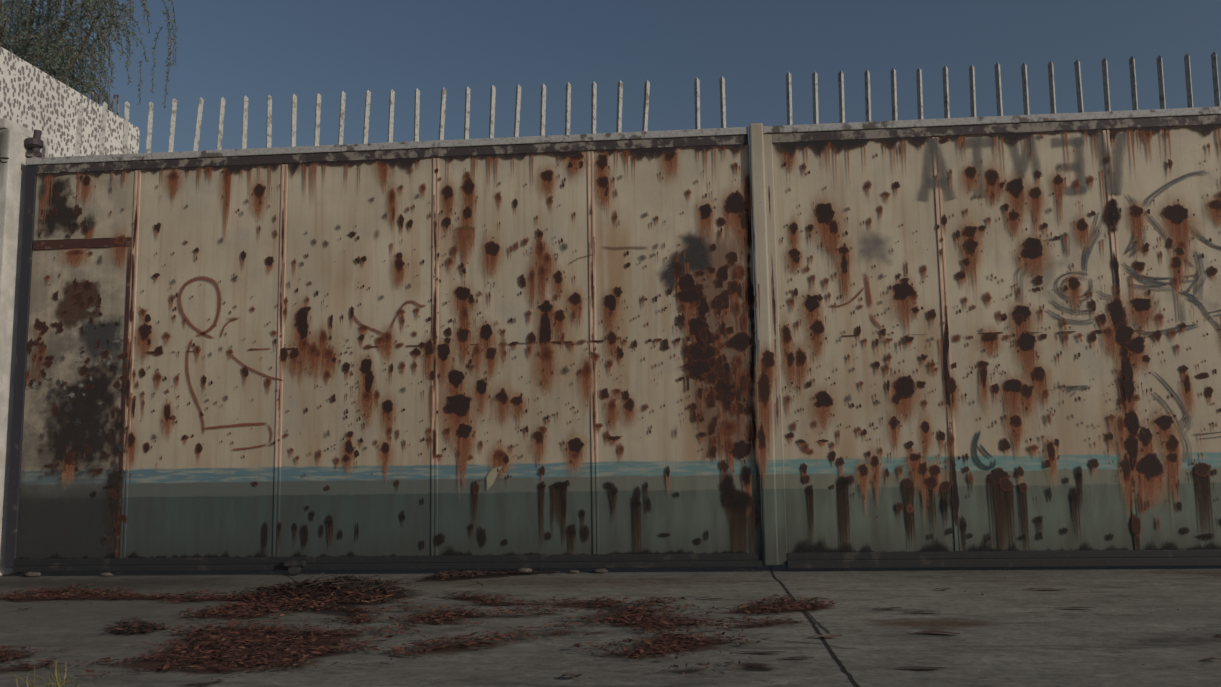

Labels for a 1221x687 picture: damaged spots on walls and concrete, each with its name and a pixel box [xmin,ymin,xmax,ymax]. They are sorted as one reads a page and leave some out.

rust [38,124,1221,572]
crack [769,567,861,687]